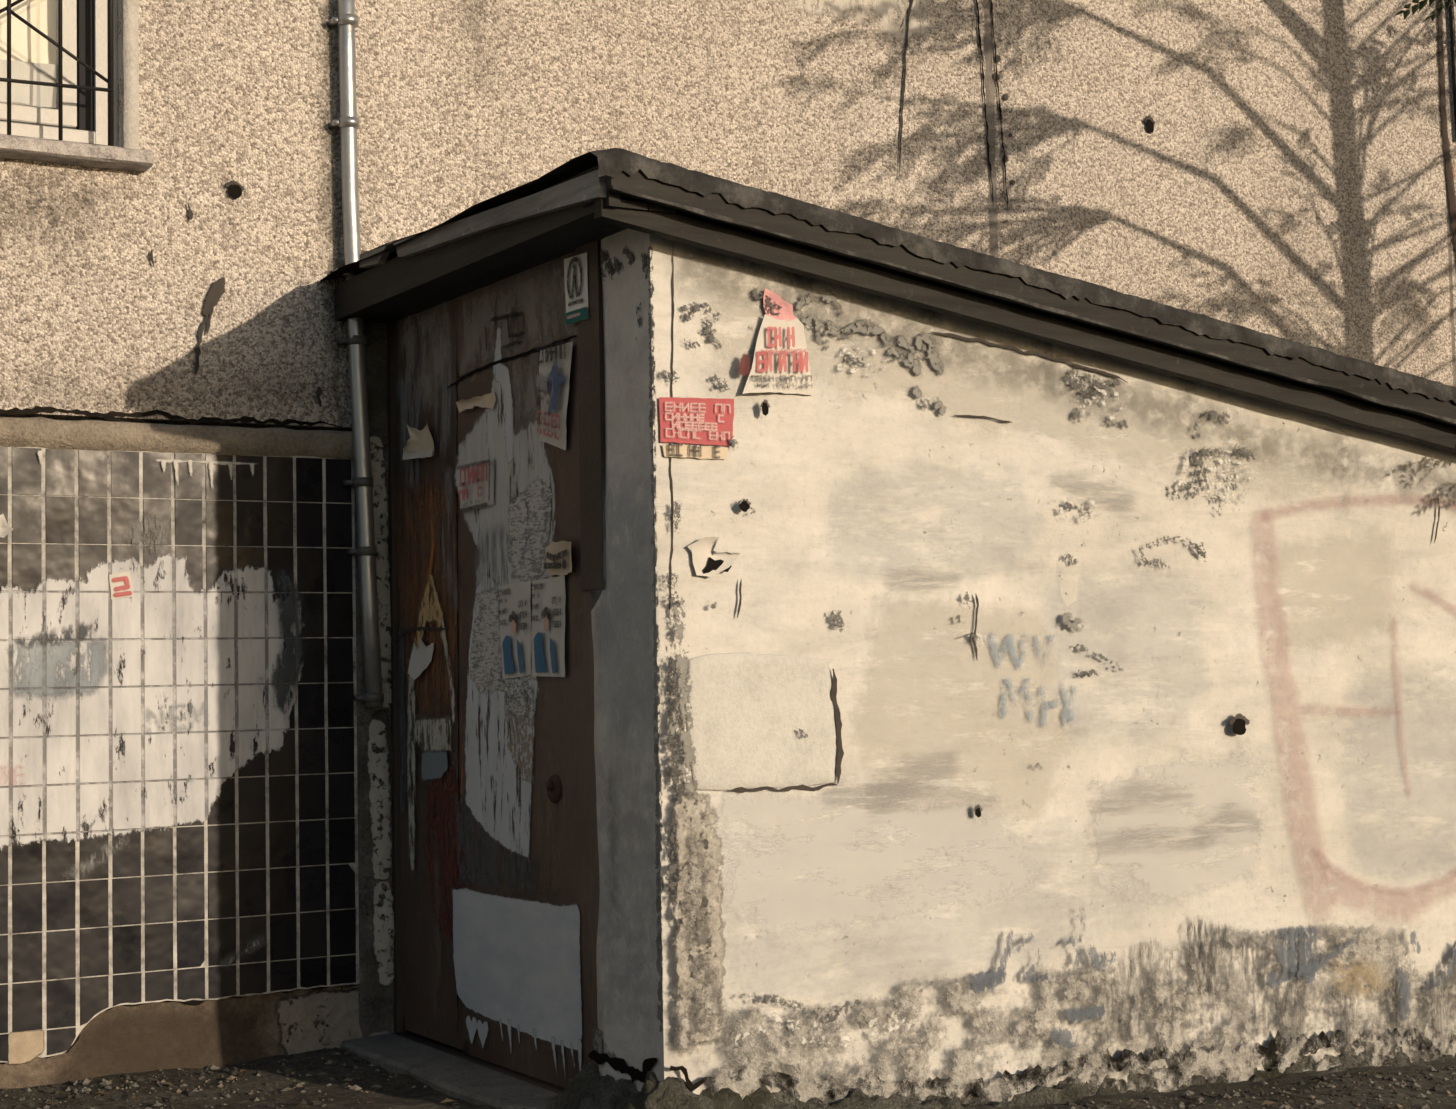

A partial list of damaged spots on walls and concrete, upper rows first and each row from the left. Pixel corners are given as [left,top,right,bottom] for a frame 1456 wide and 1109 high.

crack [898,0,913,179]
crack [975,0,1008,208]
peeling [367,436,395,986]
corrosion [397,485,459,710]
peeling [599,246,1456,1108]
spalling [274,984,389,1055]